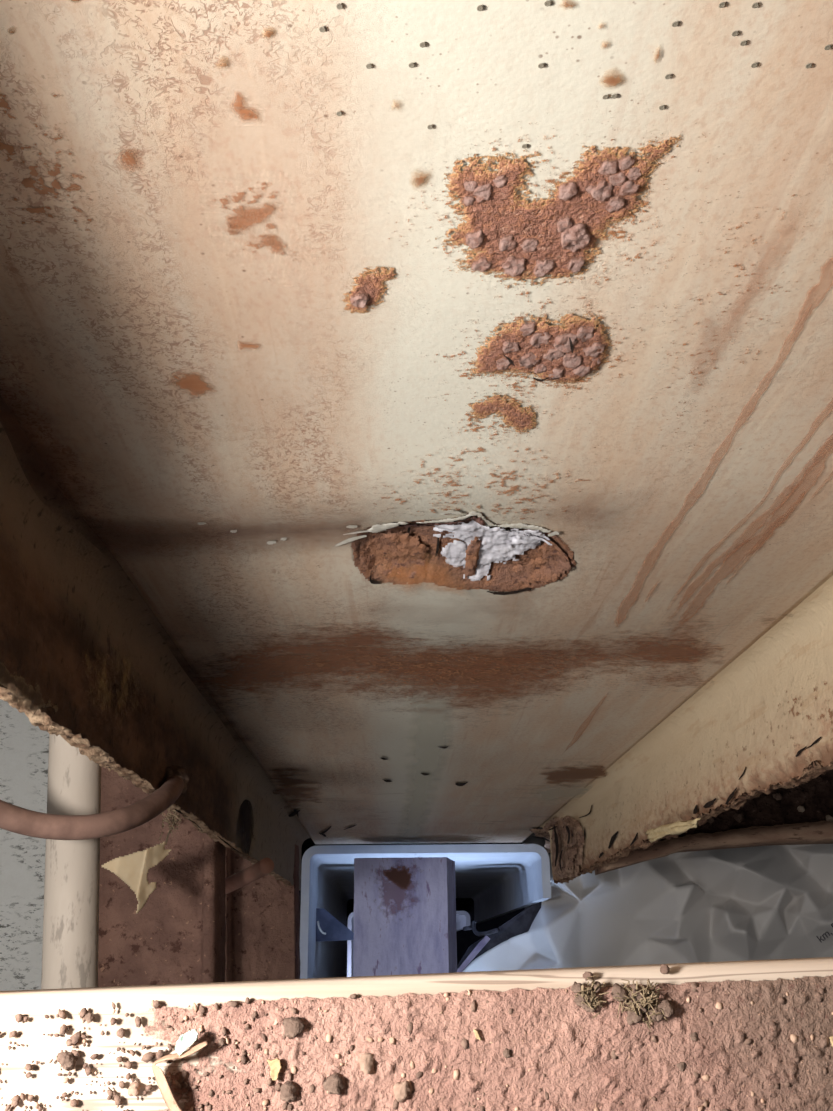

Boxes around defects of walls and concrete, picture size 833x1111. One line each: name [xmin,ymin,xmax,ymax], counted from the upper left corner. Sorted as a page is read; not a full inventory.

rust [214,183,296,254]
rust [342,266,408,314]
rust [373,135,683,519]
peeling [335,510,576,595]
rust [196,627,718,712]
peeling [529,816,585,879]
peeling [645,818,701,843]